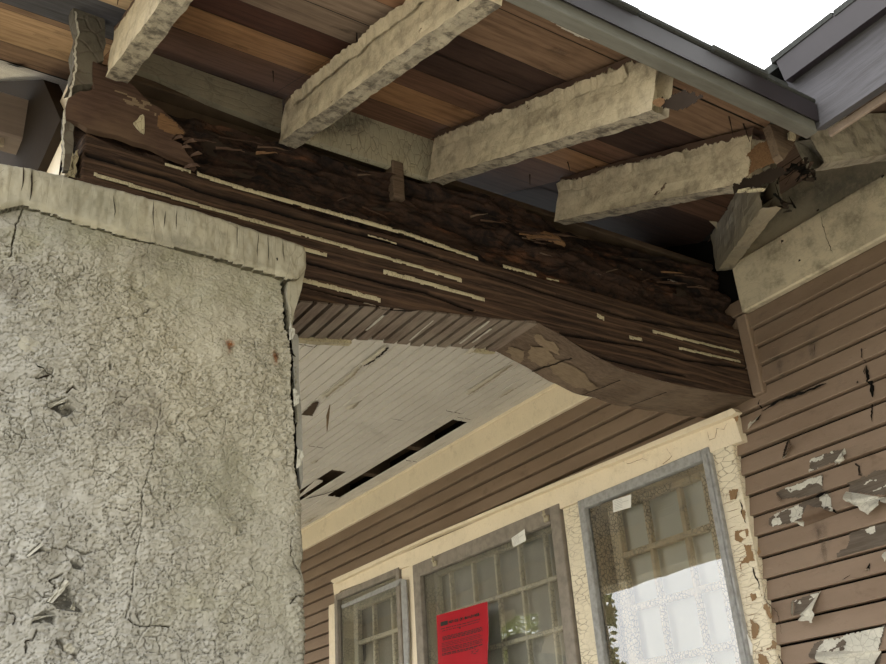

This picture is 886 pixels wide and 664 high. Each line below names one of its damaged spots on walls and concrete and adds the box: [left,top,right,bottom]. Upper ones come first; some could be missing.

peeling [133,114,145,134]
crack [2,166,33,257]
crack [152,202,187,227]
crack [281,292,304,479]
crack [861,348,874,420]
peeling [769,448,846,527]
peeling [843,470,886,515]
peeling [735,509,761,569]
spalling [30,580,80,641]
peeling [791,592,820,623]
peeling [758,640,777,664]
peeling [809,625,886,664]